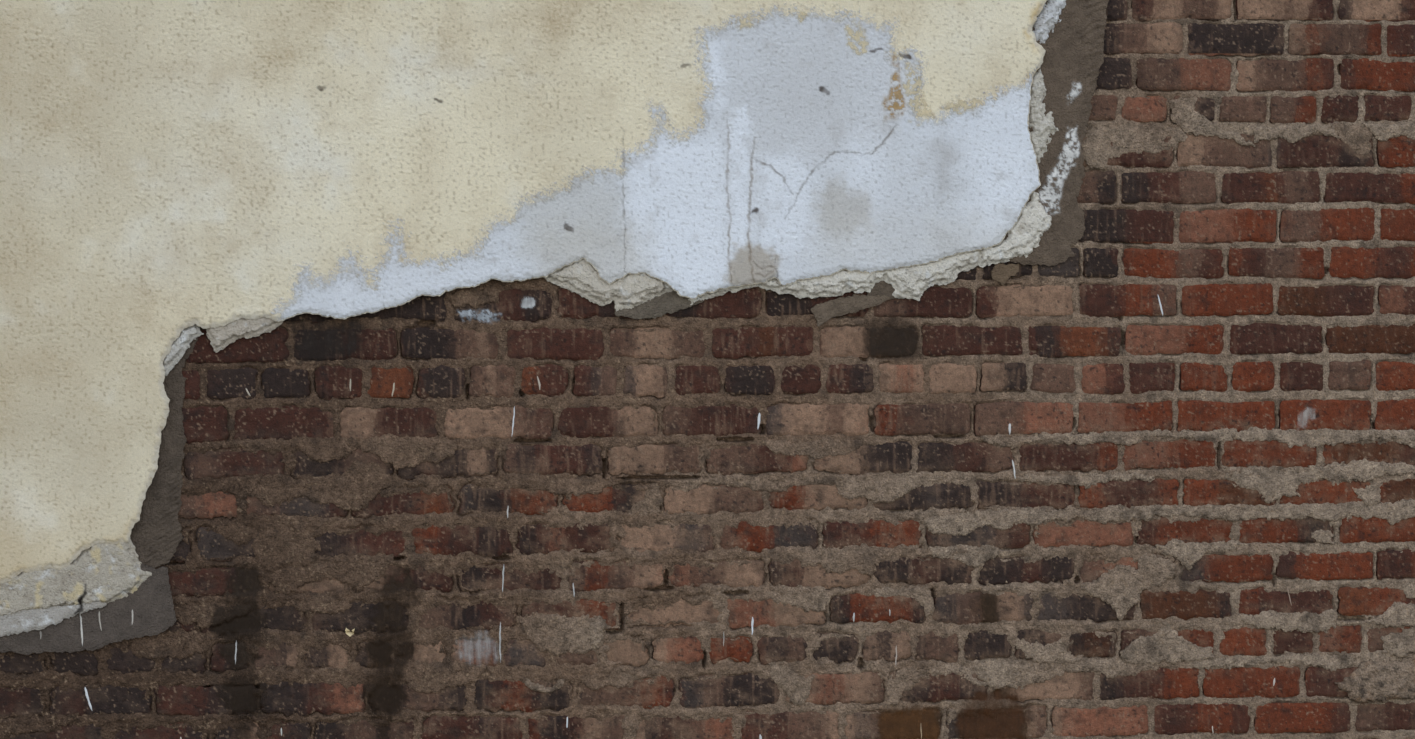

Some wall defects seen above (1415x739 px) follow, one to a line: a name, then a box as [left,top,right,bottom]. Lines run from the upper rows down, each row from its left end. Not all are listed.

peeling [163,6,1059,376]
flaking render [1033,0,1066,44]